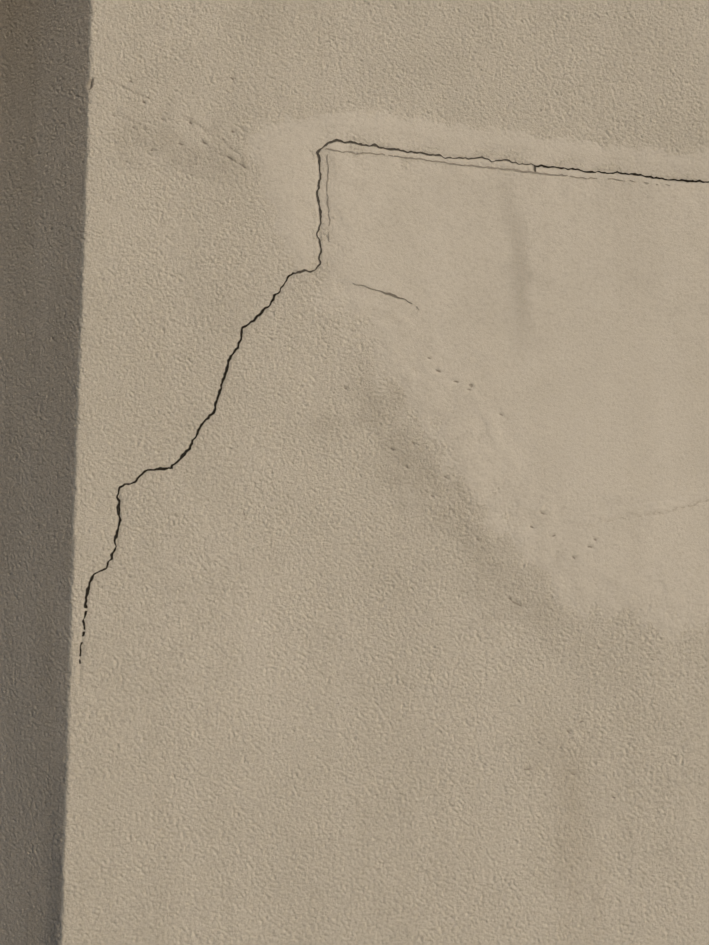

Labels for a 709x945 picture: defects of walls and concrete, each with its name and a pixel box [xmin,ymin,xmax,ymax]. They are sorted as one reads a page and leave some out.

crack [79,139,709,664]